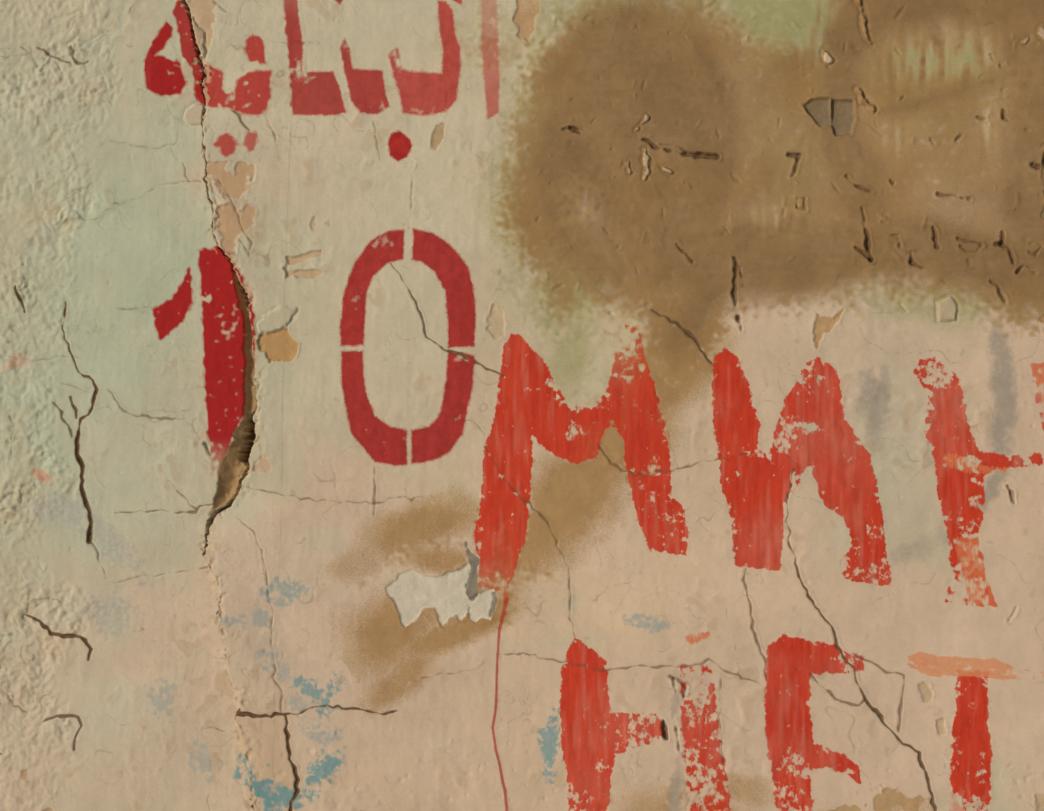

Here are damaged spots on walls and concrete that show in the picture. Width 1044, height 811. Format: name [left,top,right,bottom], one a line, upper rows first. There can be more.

peeling [511,0,543,43]
peeling [854,0,873,45]
peeling [801,86,877,137]
peeling [285,249,324,280]
crack [12,284,27,315]
peeling [283,306,301,363]
crack [23,0,768,811]
peeling [384,540,499,629]
crack [784,467,939,811]
crack [3,685,84,753]
peeling [826,783,931,811]